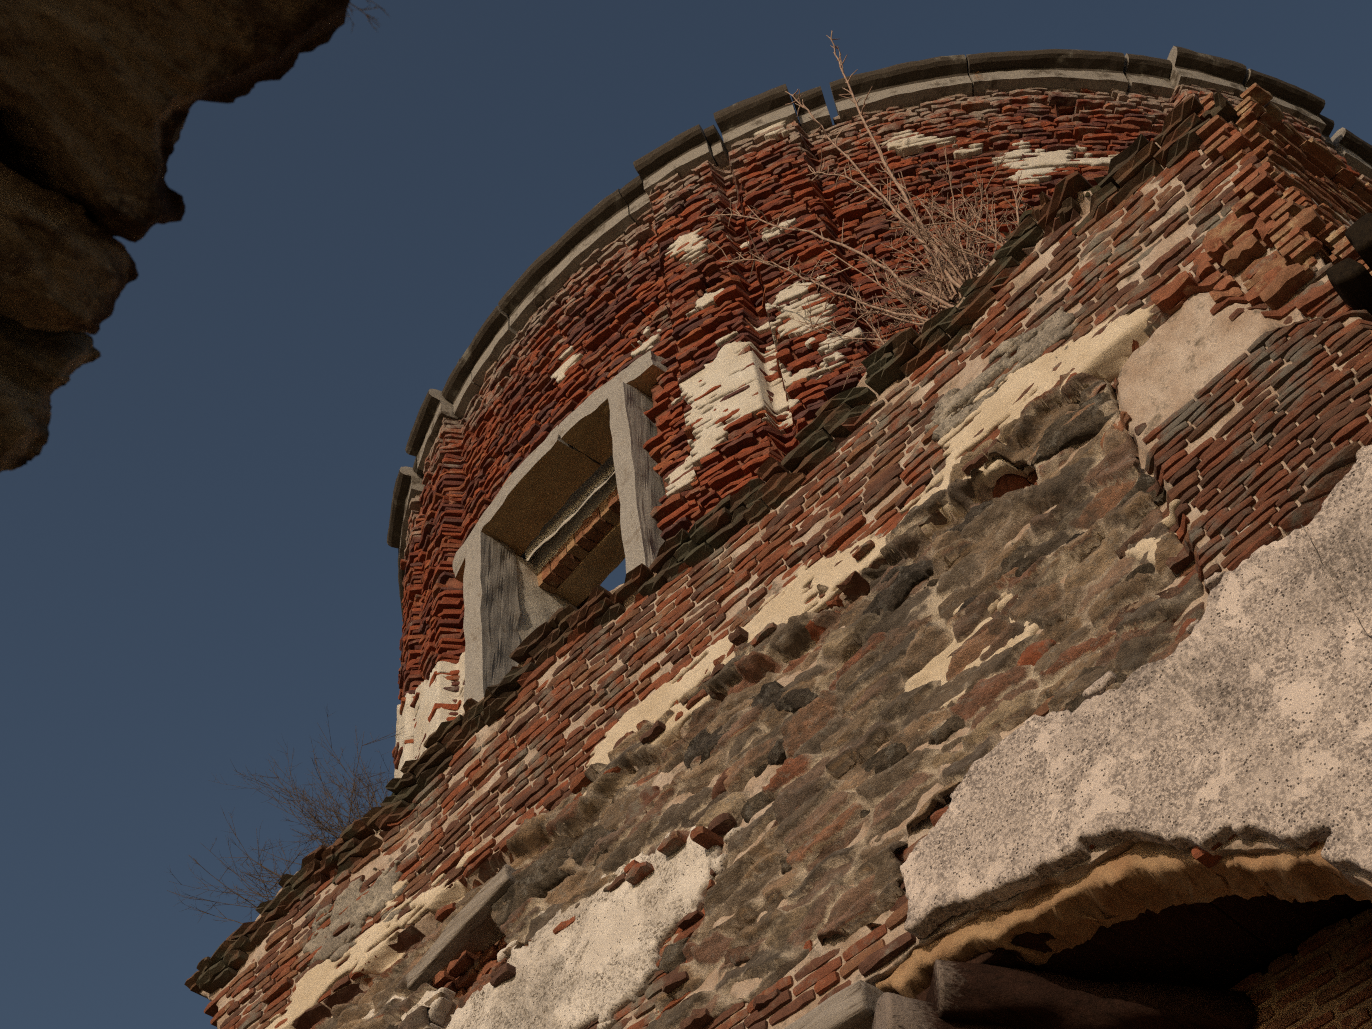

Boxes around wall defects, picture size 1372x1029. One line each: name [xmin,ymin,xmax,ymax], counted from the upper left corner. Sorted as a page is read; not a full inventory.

peeling [754,120,790,141]
peeling [881,130,1118,185]
peeling [551,346,583,384]
peeling [569,207,1335,796]
crack [1301,525,1371,637]
peeling [900,445,1372,938]
peeling [362,826,744,1029]